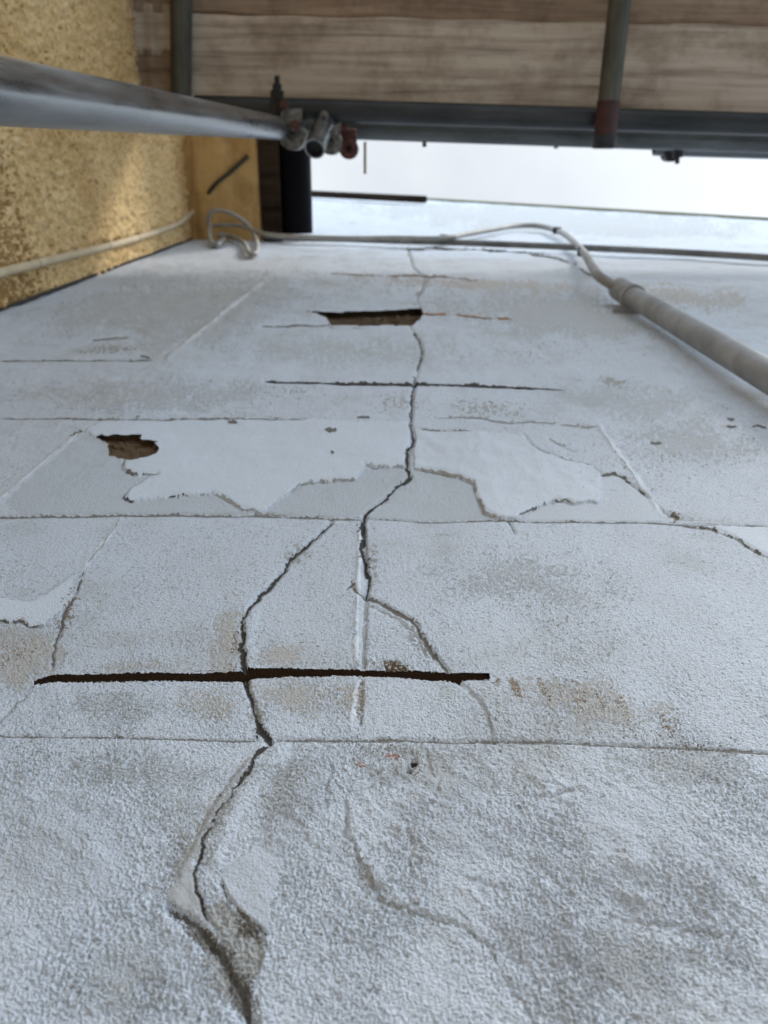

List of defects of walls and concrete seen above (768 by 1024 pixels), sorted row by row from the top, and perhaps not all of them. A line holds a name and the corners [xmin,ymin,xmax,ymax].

spalling [307,308,423,328]
peeling [6,435,761,555]
crack [51,519,120,667]
rust [72,582,375,730]
crack [169,246,598,1024]